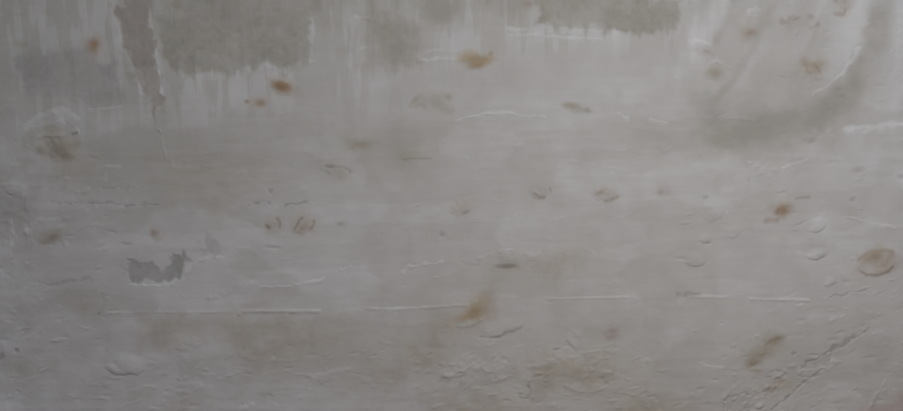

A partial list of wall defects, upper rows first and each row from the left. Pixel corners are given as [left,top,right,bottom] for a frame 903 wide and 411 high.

corrosion [453,45,500,74]
corrosion [262,74,307,99]
corrosion [763,194,812,227]
peeling [116,248,228,289]
corrosion [843,238,903,284]
corrosion [449,280,501,334]
crack [721,326,872,411]